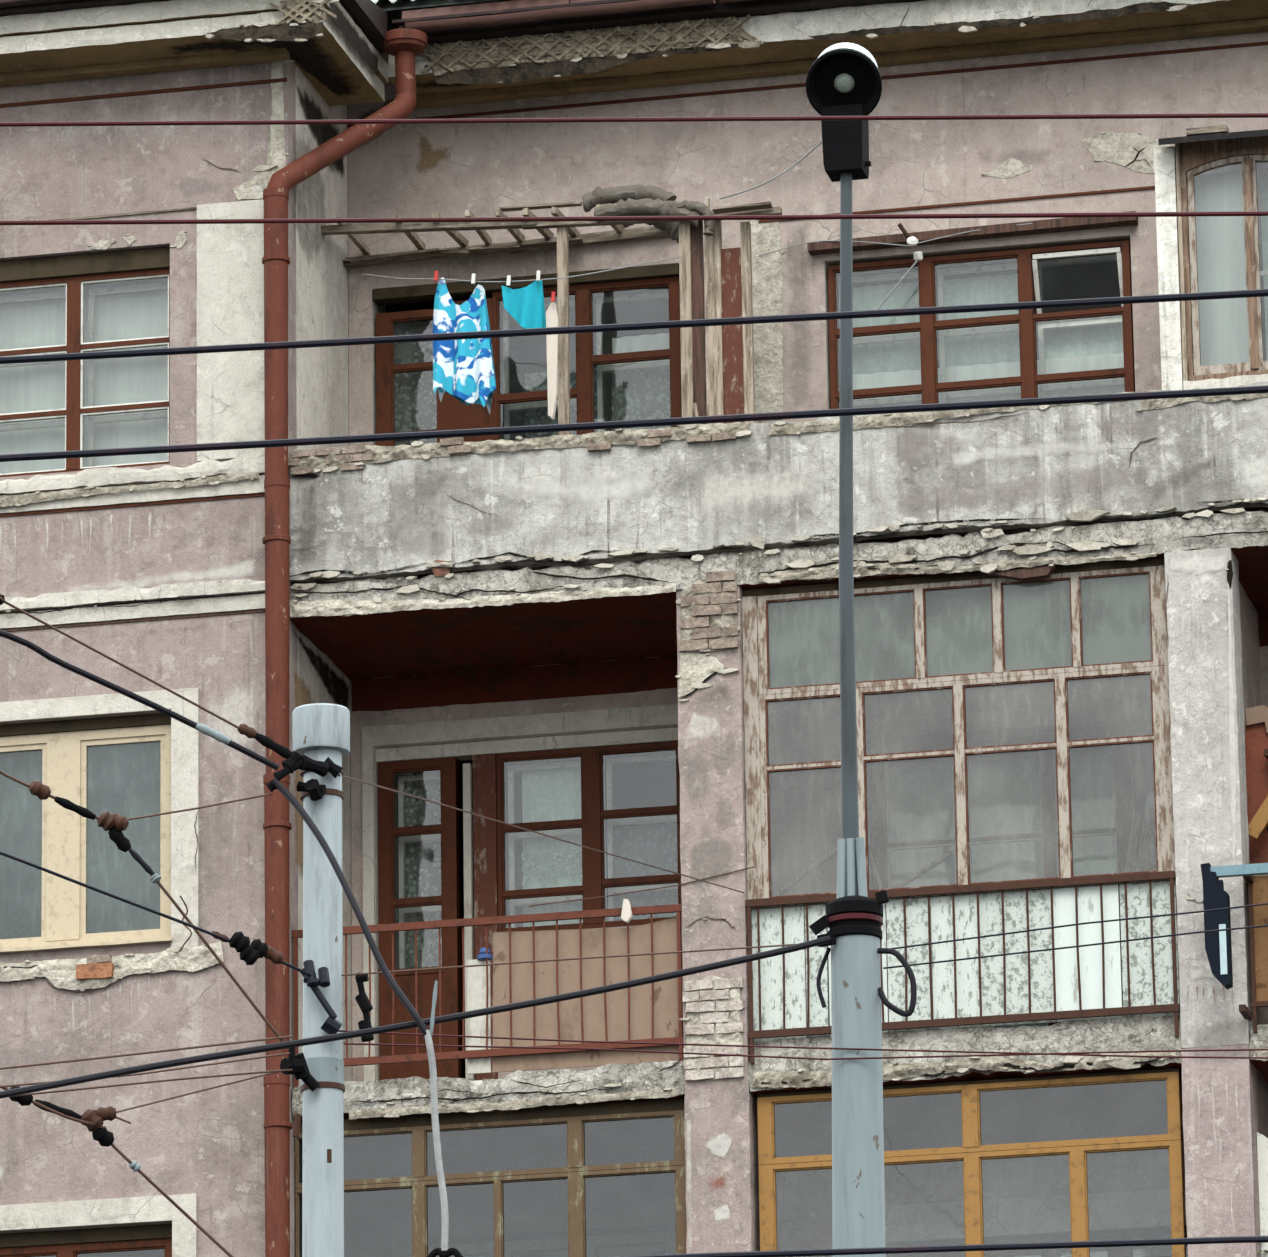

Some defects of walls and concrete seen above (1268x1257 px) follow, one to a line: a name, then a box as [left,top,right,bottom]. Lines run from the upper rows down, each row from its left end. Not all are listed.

spalling [809,0,1194,40]
spalling [422,14,765,84]
peeling [981,158,1031,178]
peeling [1080,131,1170,173]
flaking render [980,528,1004,538]
spalling [757,550,1159,584]
spalling [1225,560,1234,588]
flaking render [290,570,741,698]
spalling [0,941,224,991]
flaking render [349,975,832,1120]
spalling [882,1052,1177,1081]